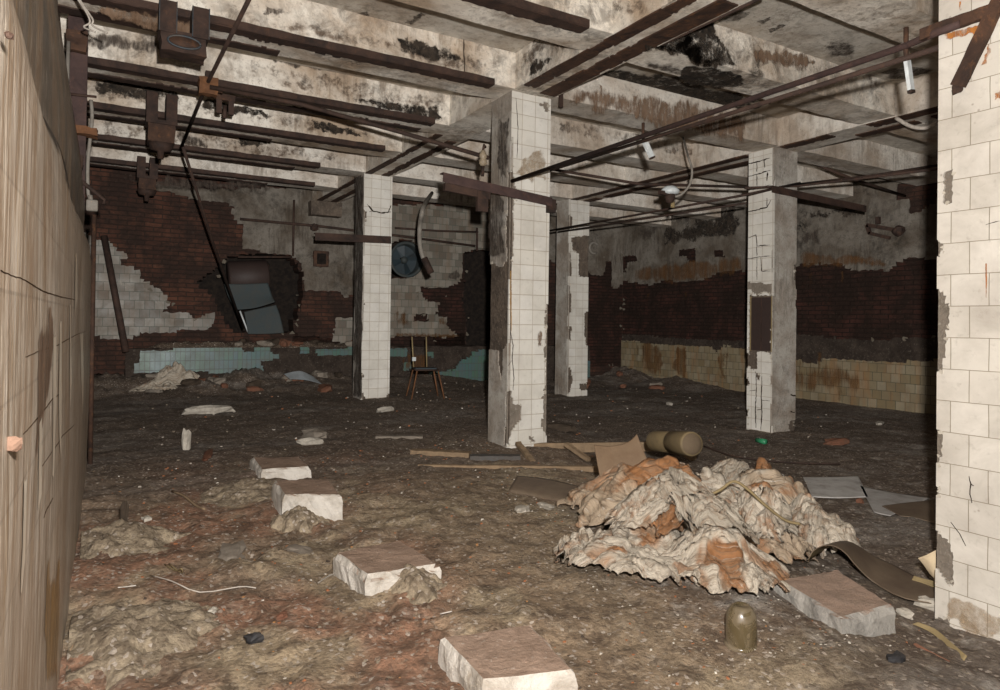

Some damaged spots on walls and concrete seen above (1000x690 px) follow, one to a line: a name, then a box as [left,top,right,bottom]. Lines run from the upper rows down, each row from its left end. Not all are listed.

rust [947,26,978,39]
damp [95,80,179,101]
damp [202,99,268,119]
damp [573,23,746,141]
spalling [897,170,956,215]
spalling [84,188,365,352]
spalling [490,164,522,446]
spalling [567,214,774,386]
spalling [793,241,950,374]
spalling [567,366,587,396]
spalling [936,531,954,587]